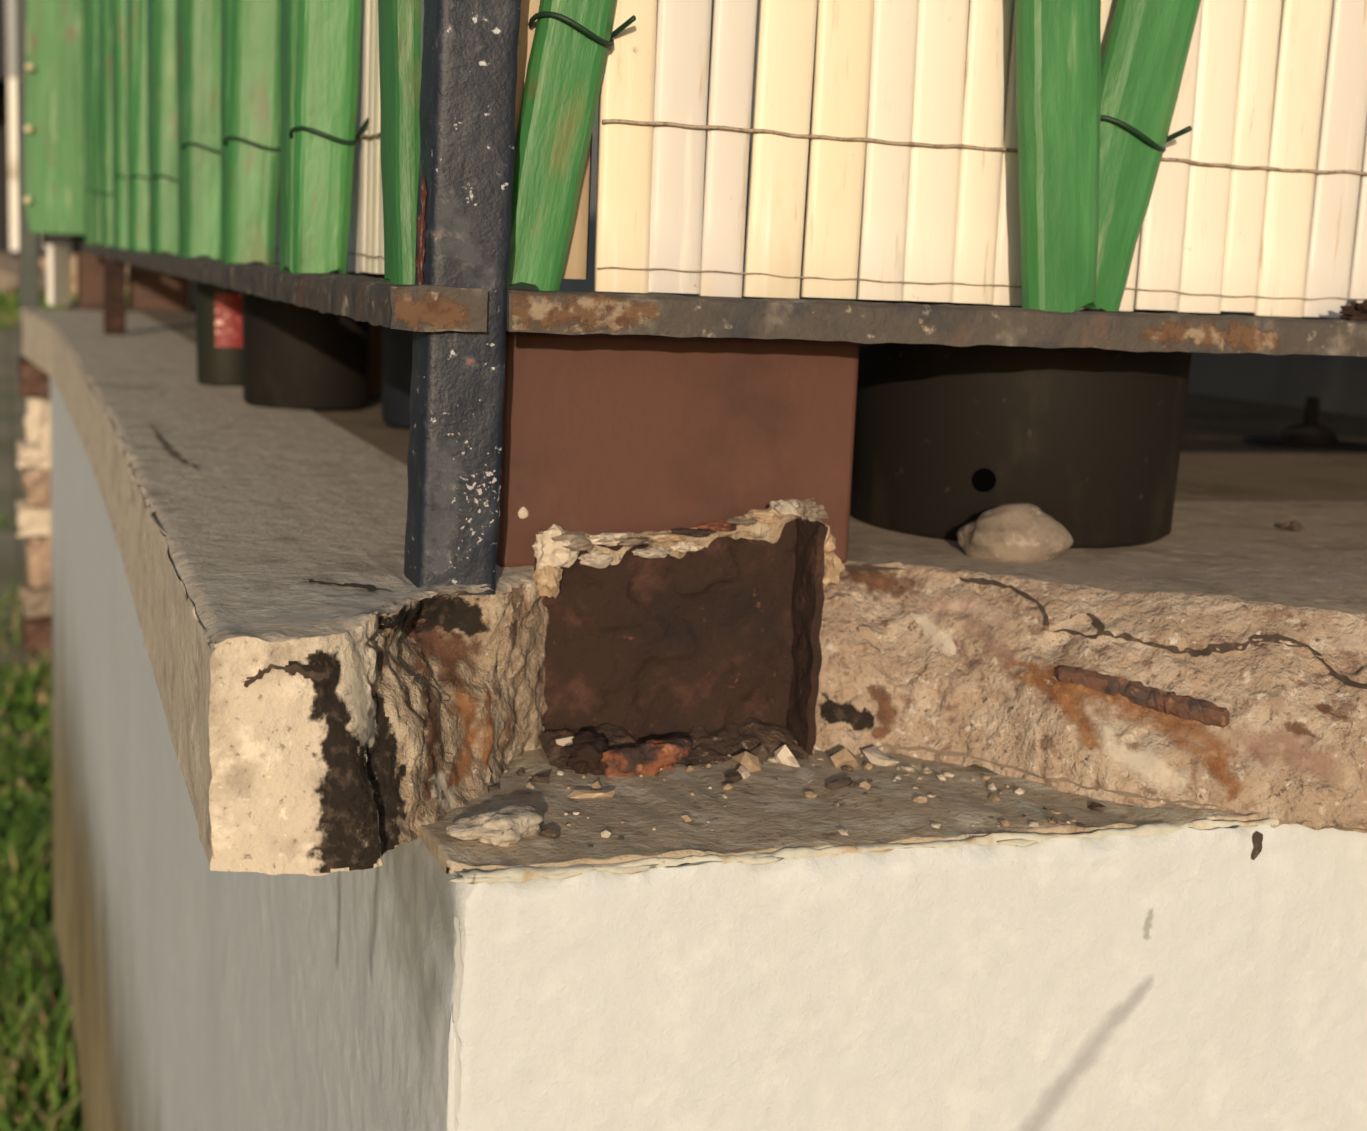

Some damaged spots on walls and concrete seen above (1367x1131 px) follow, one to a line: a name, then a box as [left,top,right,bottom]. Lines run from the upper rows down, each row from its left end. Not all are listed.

corrosion [512,290,659,332]
peeling [532,499,846,598]
crack [959,577,1367,689]
leakage [285,650,406,873]
leakage [376,606,479,808]
corrosion [446,678,494,789]
corrosion [1008,660,1239,799]